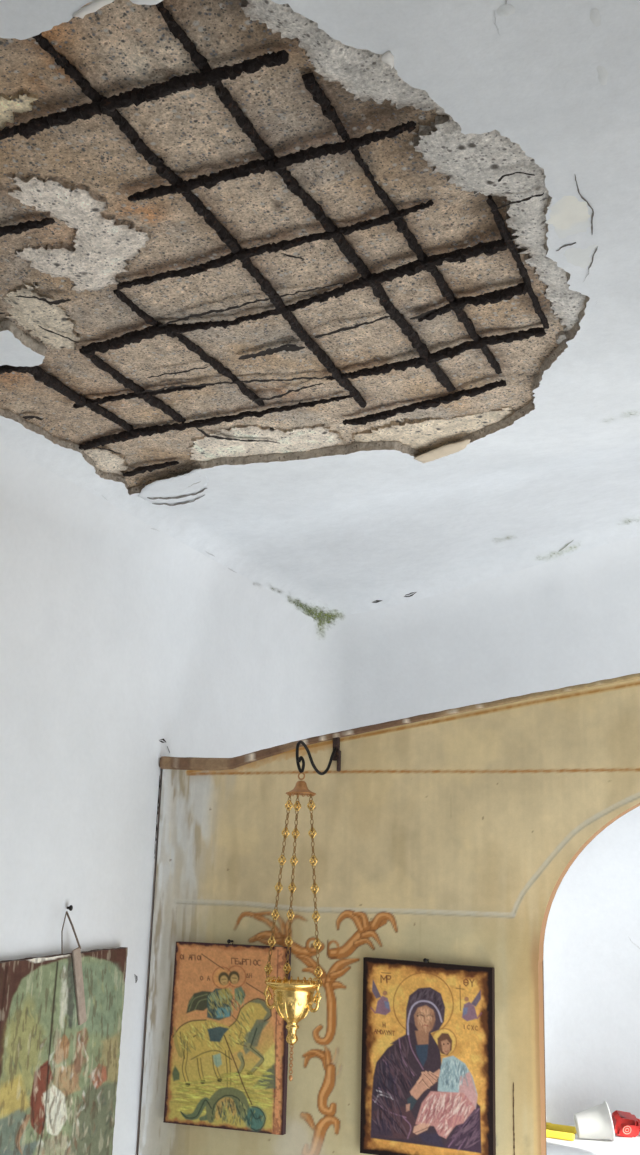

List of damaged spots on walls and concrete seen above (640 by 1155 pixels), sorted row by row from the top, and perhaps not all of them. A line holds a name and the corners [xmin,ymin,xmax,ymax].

spalling [0,0,598,504]
crack [496,172,544,209]
crack [556,176,598,277]